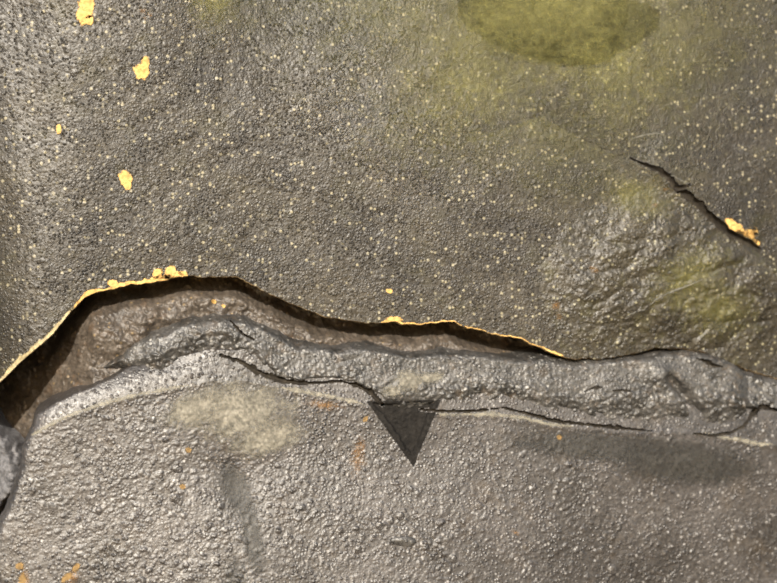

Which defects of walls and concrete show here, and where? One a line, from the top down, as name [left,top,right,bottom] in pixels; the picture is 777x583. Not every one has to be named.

crack [630,157,761,249]
crack [230,320,254,340]
crack [220,353,383,405]
spalling [0,266,705,439]
crack [585,385,629,393]
crack [697,358,721,368]
spalling [170,382,298,455]
spalling [363,399,441,467]
crack [419,407,650,432]
crack [693,403,777,437]
peeling [61,563,80,583]